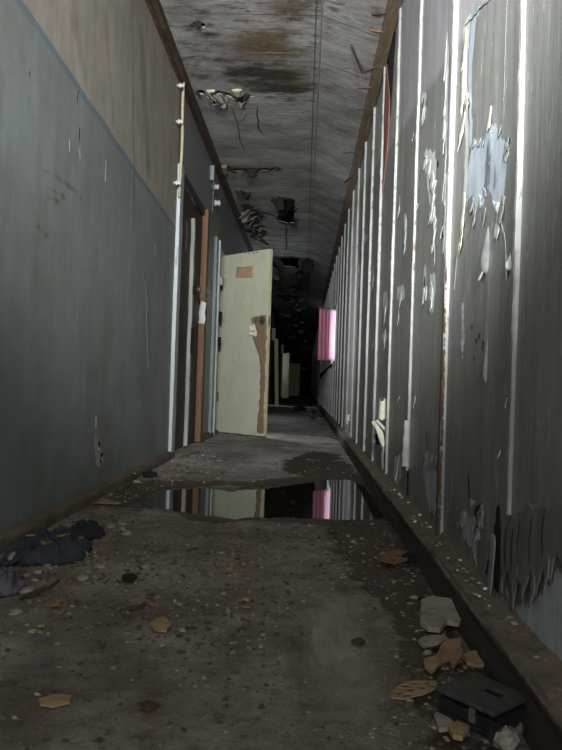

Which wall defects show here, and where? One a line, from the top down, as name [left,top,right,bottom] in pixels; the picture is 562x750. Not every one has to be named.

crack [231,106,262,152]
water stain [225,67,303,93]
peeling [421,32,449,313]
peeling [456,0,509,256]
peeling [364,395,387,471]
rust [435,266,447,536]
peeling [455,498,562,661]